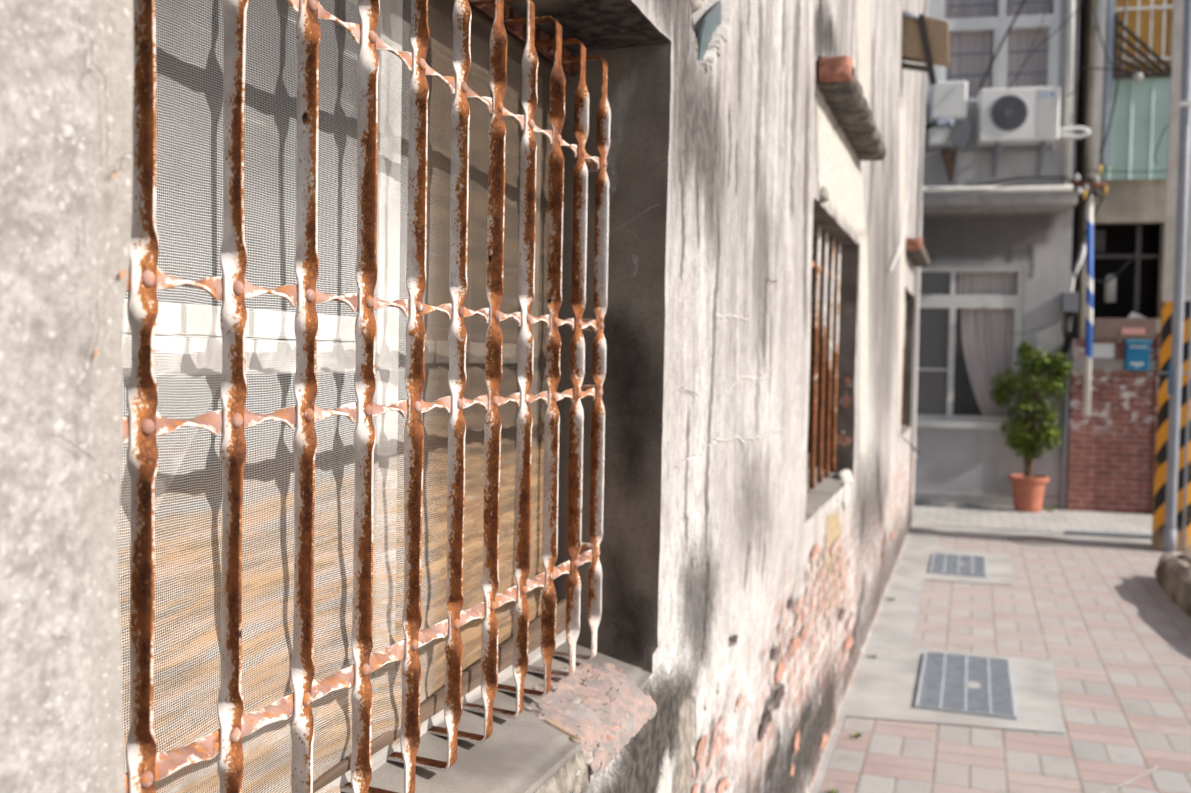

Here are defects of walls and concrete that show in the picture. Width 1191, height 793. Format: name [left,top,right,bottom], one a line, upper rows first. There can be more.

flaking render [690,0,727,74]
water stain [739,2,763,188]
water stain [782,1,810,237]
peeling [759,535,859,740]
spalling [516,661,657,780]
peeling [691,678,745,793]
flaking render [789,728,800,777]